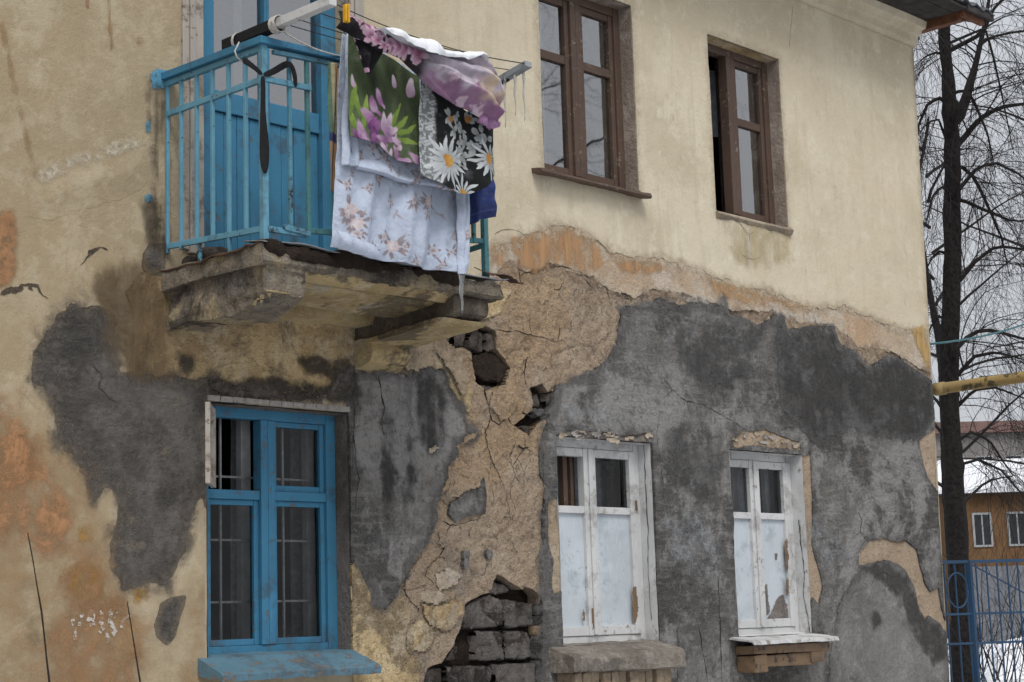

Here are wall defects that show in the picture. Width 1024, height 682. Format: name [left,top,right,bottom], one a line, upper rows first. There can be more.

leakage [142,202,159,245]
leakage [97,265,194,379]
flaking render [125,225,931,682]
crack [643,377,741,533]
flaking render [920,430,936,488]
crack [418,389,546,675]
flaking render [859,538,945,630]